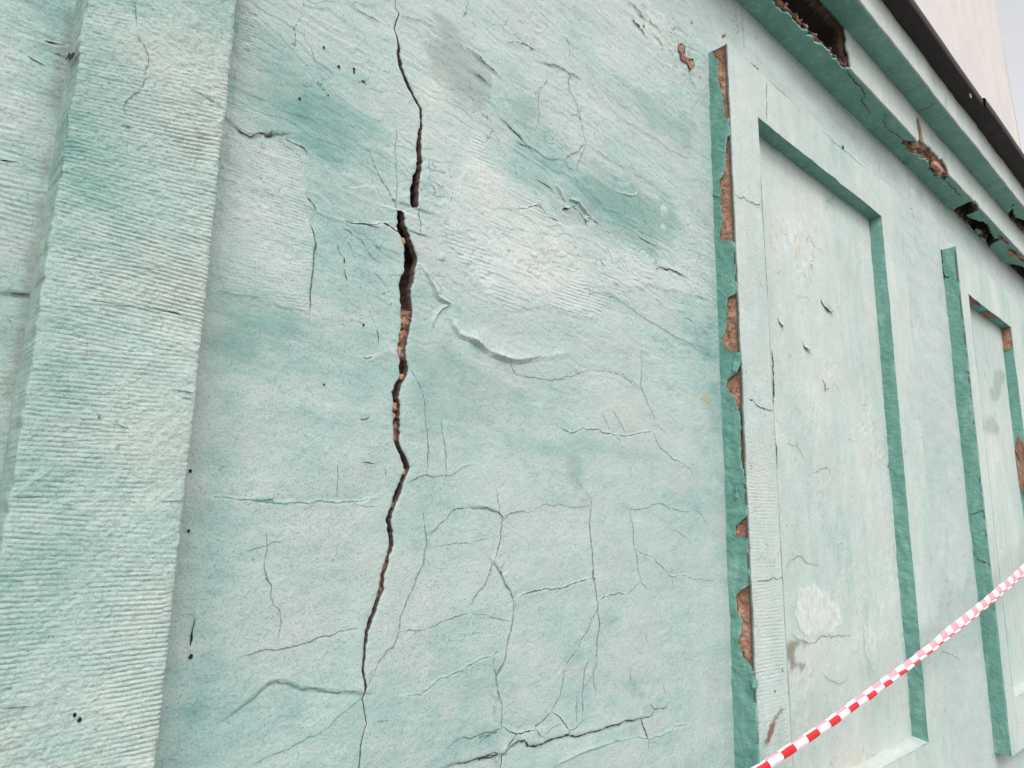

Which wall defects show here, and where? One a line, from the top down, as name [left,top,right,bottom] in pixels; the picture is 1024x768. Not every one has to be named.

flaking render [713,33,728,119]
flaking render [773,0,848,67]
flaking render [720,136,733,241]
flaking render [902,141,947,179]
flaking render [953,201,1024,279]
crack [214,121,469,601]
crack [511,352,691,471]
flaking render [723,294,743,463]
flaking render [969,297,1012,351]
flaking render [1015,436,1024,495]
crack [239,479,708,768]
flaking render [736,586,759,689]